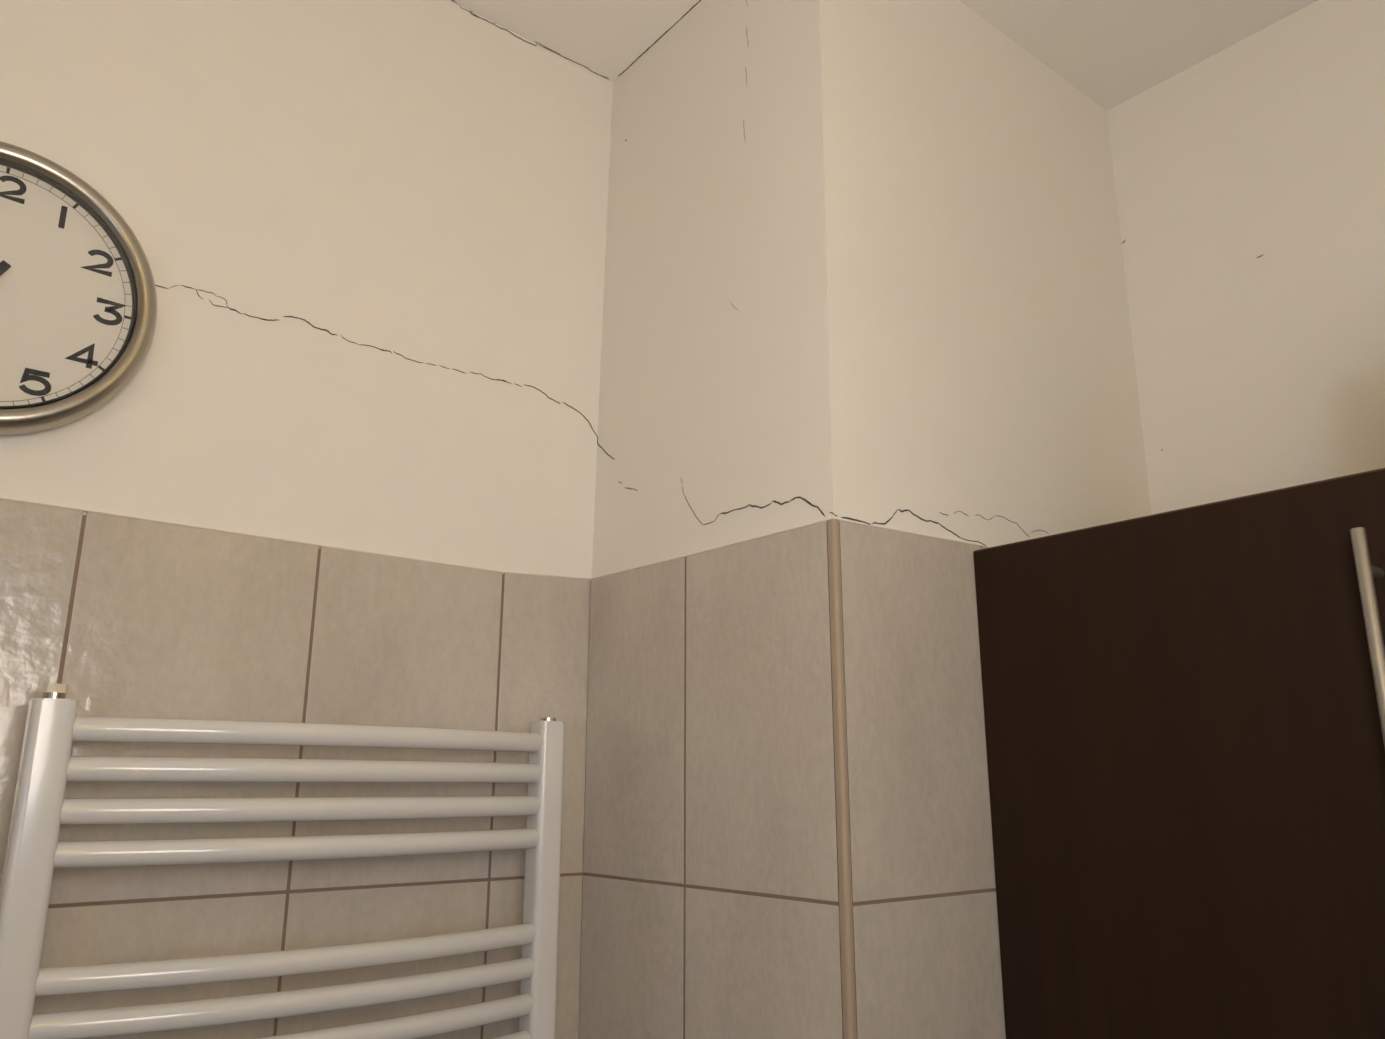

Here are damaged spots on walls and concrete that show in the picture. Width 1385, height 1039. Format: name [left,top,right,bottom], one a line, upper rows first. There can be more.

crack [452,0,701,79]
crack [155,285,638,491]
crack [681,478,1049,547]